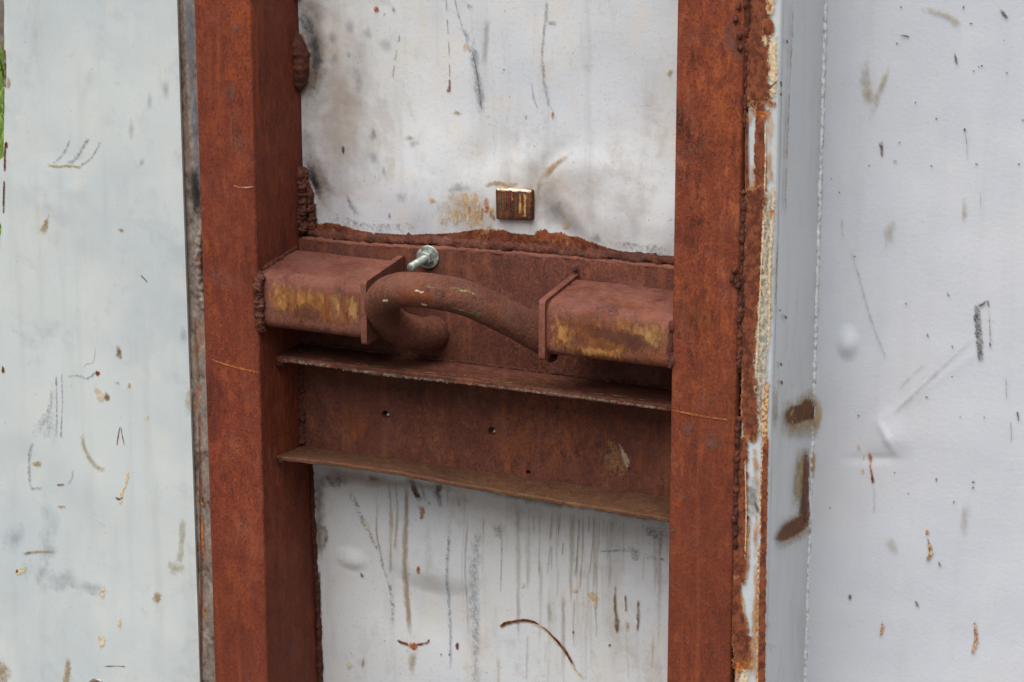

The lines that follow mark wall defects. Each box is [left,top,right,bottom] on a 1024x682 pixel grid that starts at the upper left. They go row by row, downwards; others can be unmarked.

rust [181,88,191,174]
rust [315,192,632,253]
peeling [731,0,778,682]
rust [775,380,821,434]
rust [198,412,209,682]
rust [741,435,815,682]